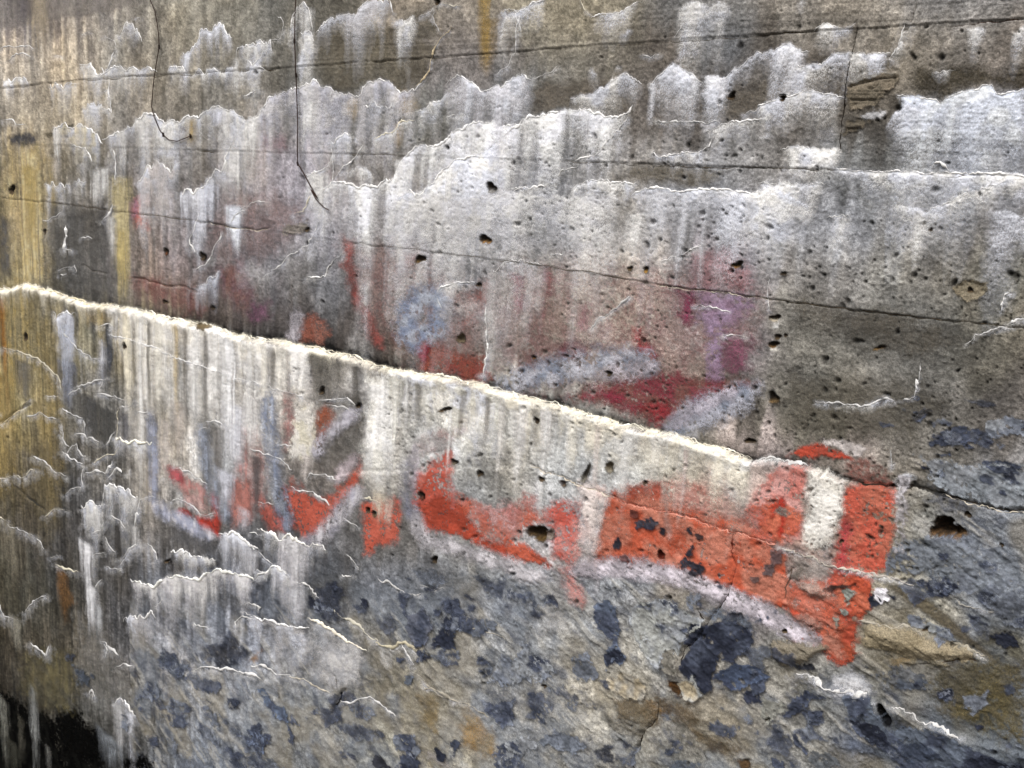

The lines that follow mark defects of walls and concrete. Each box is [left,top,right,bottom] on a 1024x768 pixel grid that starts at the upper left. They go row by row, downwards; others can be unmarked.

crack [567,32,857,172]
spalling [842,73,899,136]
leakage [44,0,1024,309]
crack [4,197,268,232]
crack [355,242,1018,328]
leakage [0,201,995,718]
spalling [525,526,554,542]
peeling [868,396,1024,648]
leakage [101,684,135,759]
leakage [892,707,958,738]